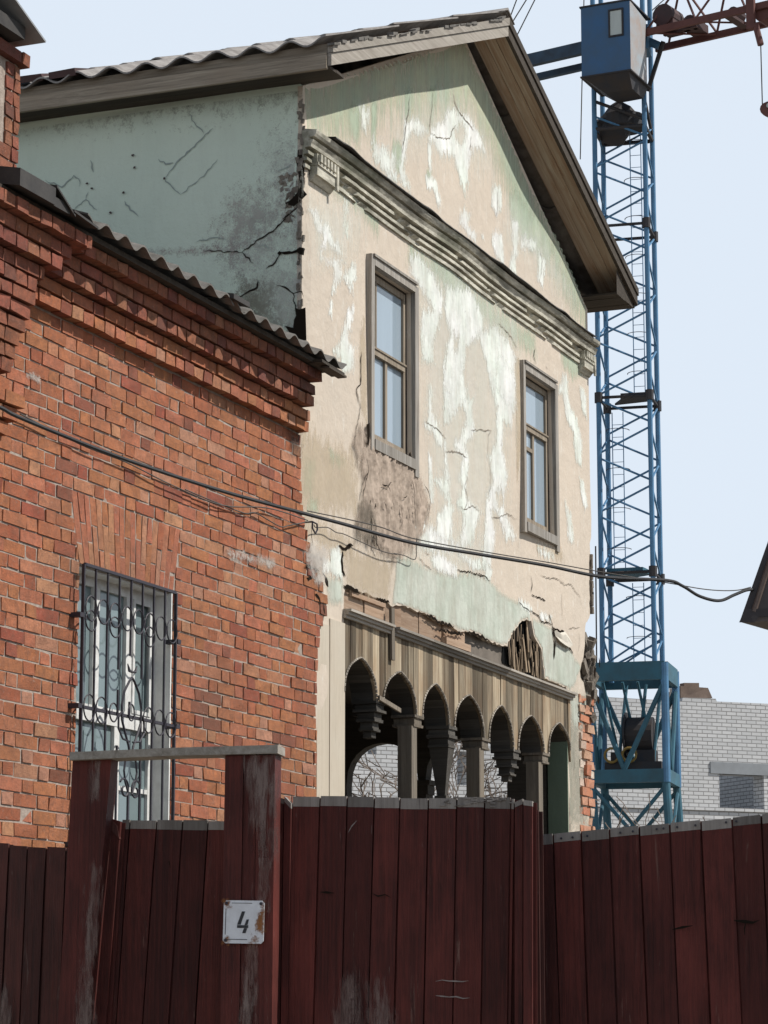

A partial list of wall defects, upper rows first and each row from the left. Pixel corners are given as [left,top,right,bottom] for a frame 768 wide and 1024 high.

crack [48,160,97,210]
crack [159,114,216,195]
crack [197,208,303,308]
peeling [359,104,486,207]
crack [403,93,475,149]
peeling [459,183,546,287]
crack [426,421,513,518]
peeling [300,252,600,832]